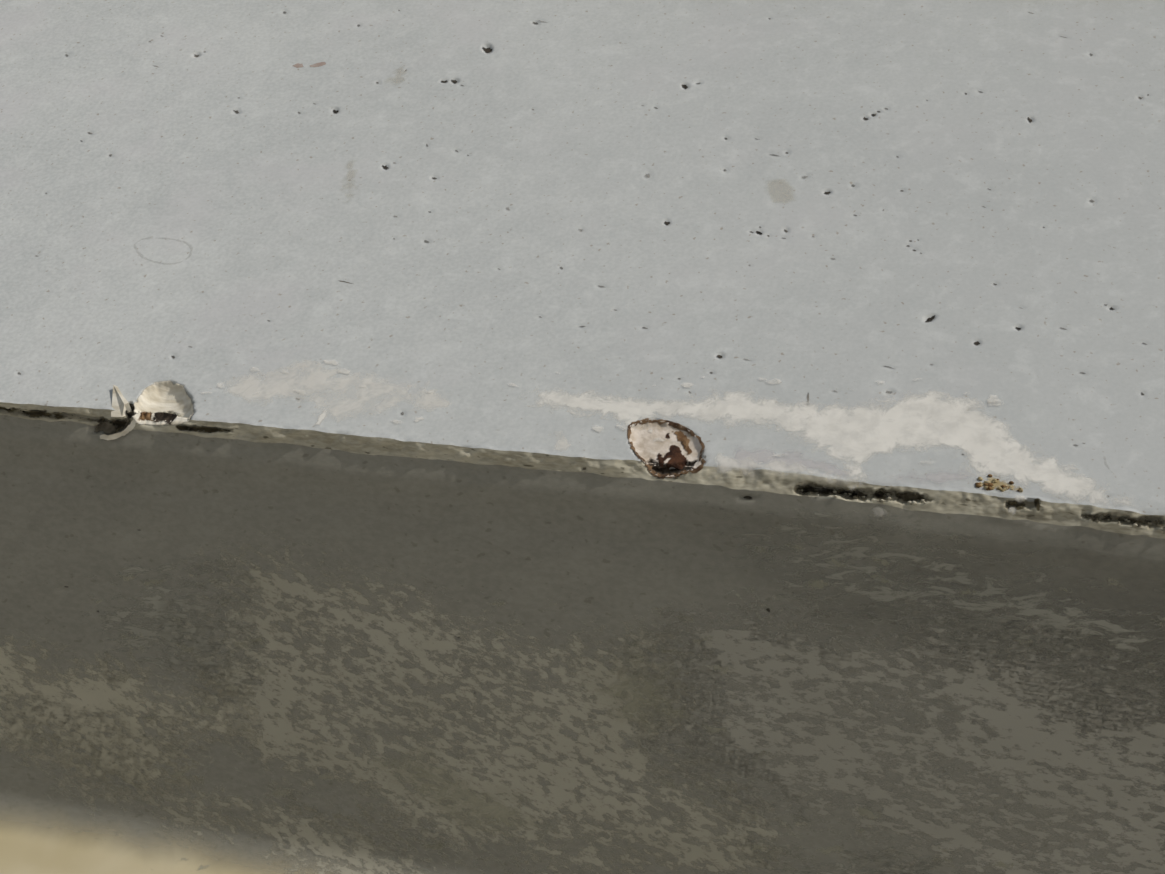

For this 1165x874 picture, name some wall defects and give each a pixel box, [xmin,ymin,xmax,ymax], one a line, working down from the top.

spalling [0,381,1165,539]
leakage [538,391,1129,504]
peeling [0,532,1165,874]